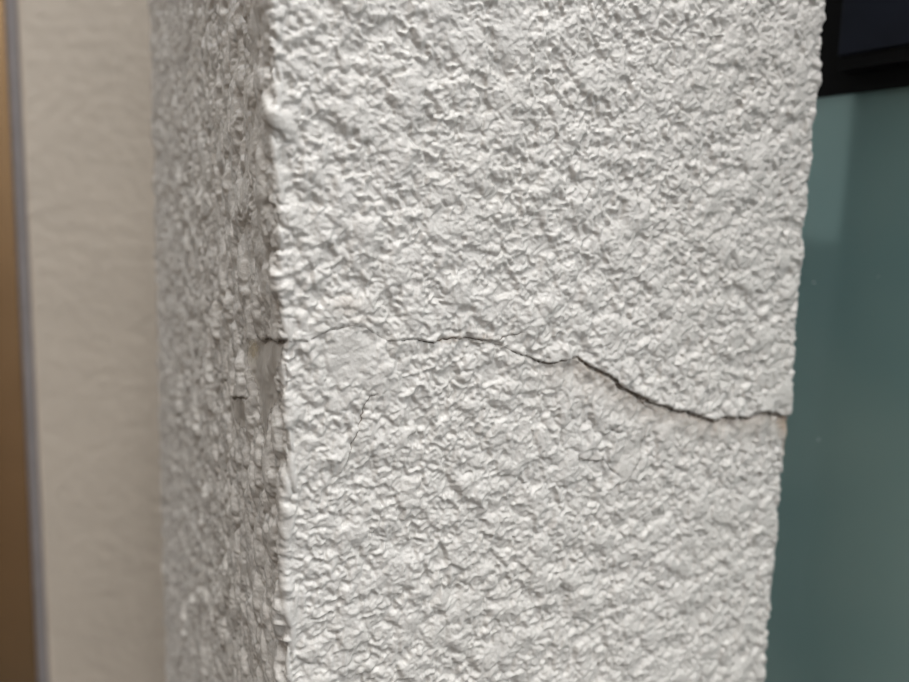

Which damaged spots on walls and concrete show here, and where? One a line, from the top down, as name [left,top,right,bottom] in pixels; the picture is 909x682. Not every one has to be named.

crack [264,325,787,484]